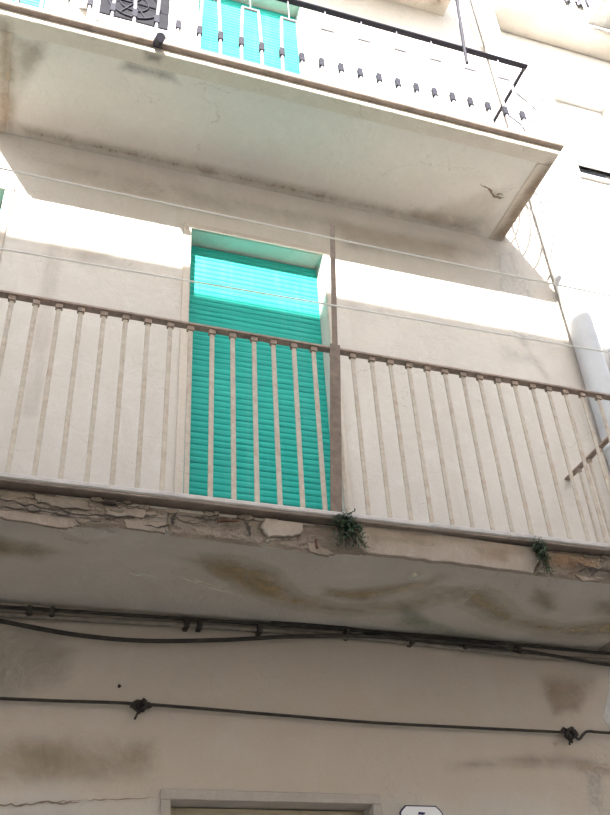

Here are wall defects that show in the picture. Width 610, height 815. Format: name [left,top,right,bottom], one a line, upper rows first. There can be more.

crack [480,184,503,199]
spalling [0,489,366,557]
spalling [532,550,610,584]
crack [0,797,151,807]